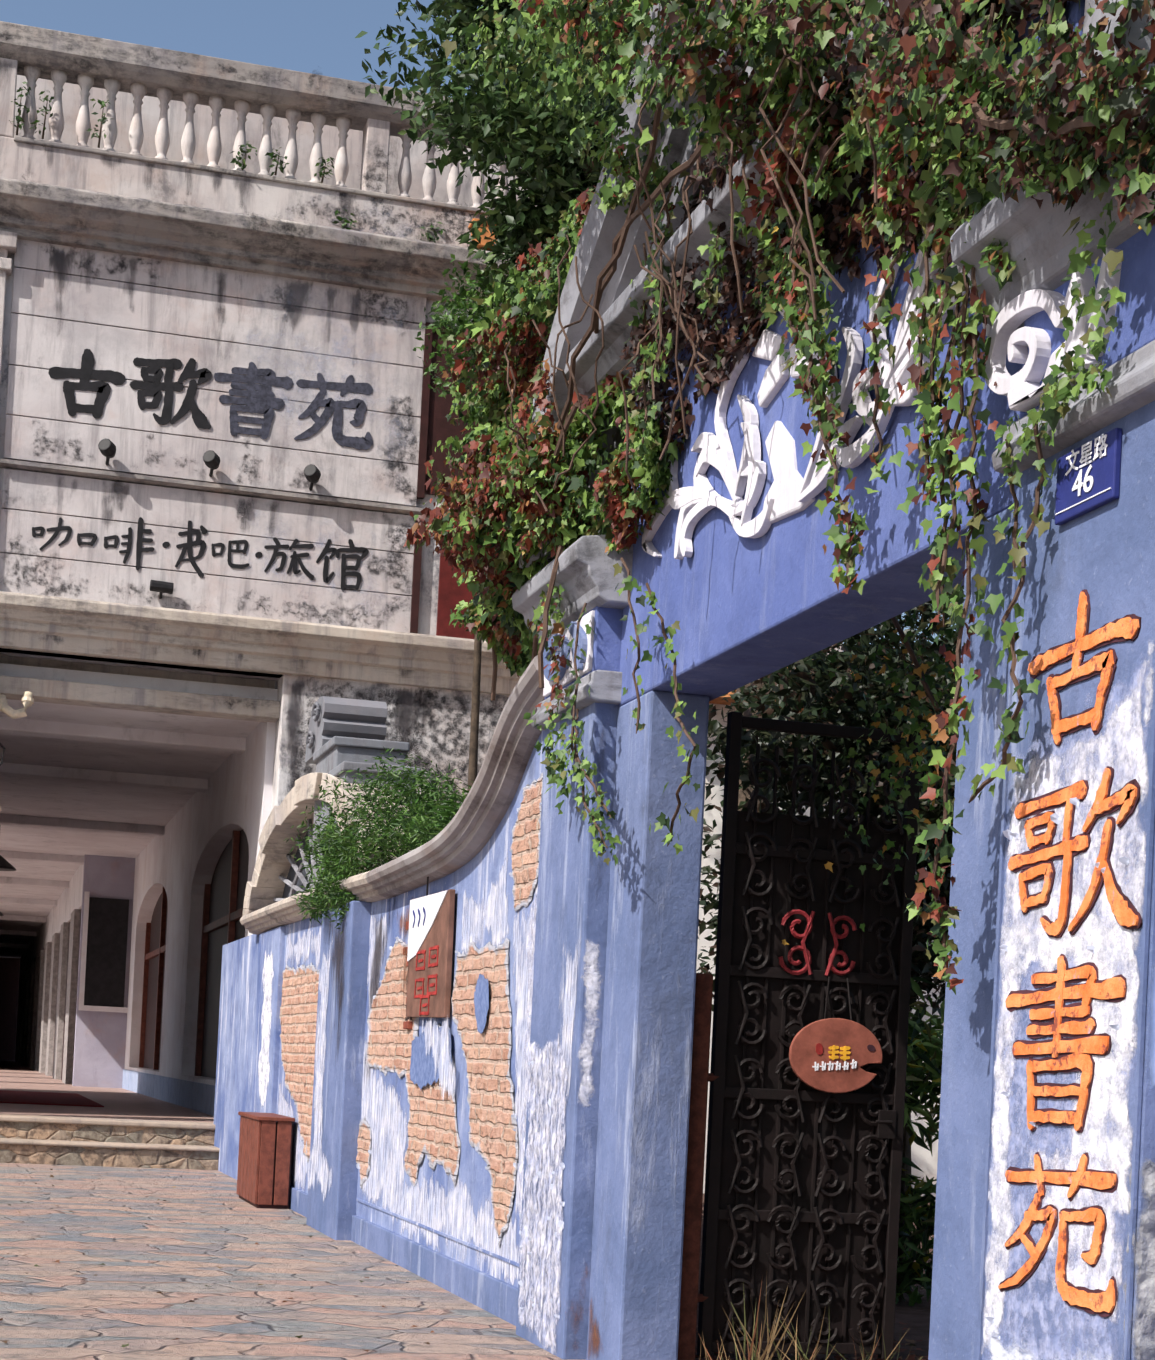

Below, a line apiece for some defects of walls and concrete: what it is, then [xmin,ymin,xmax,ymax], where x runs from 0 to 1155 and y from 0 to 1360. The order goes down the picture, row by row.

water stain [46,249,159,294]
water stain [275,283,311,325]
water stain [350,288,407,328]
water stain [384,397,417,504]
water stain [288,683,508,802]
peeling [983,645,1155,1360]
flaking render [258,926,332,1200]
flaking render [356,772,600,1353]